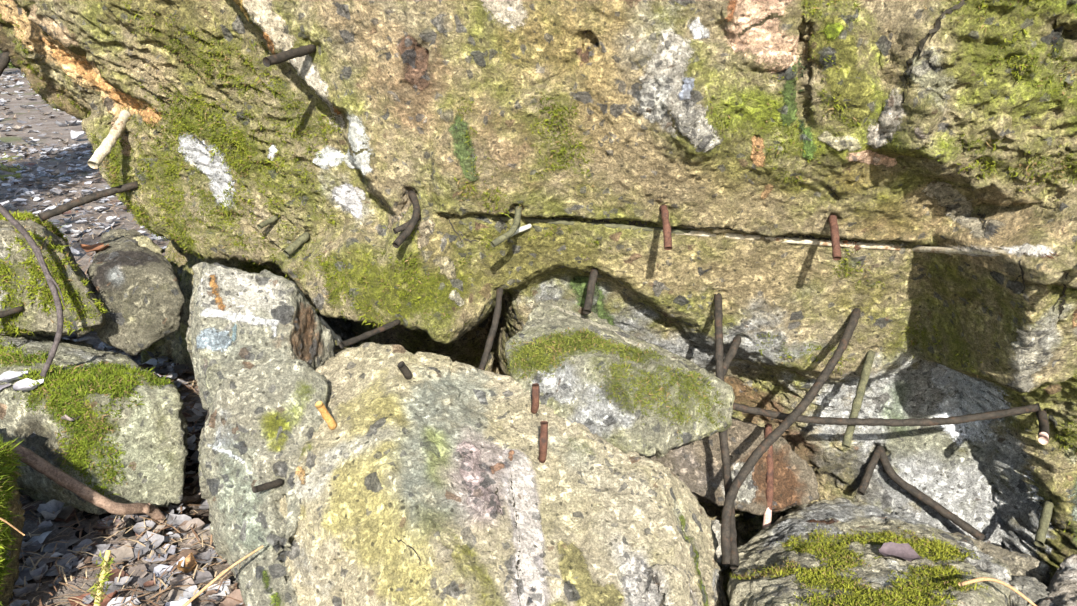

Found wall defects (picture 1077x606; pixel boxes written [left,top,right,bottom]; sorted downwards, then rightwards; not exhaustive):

crack [449,220,480,242]
crack [548,217,860,242]
crack [977,209,986,235]